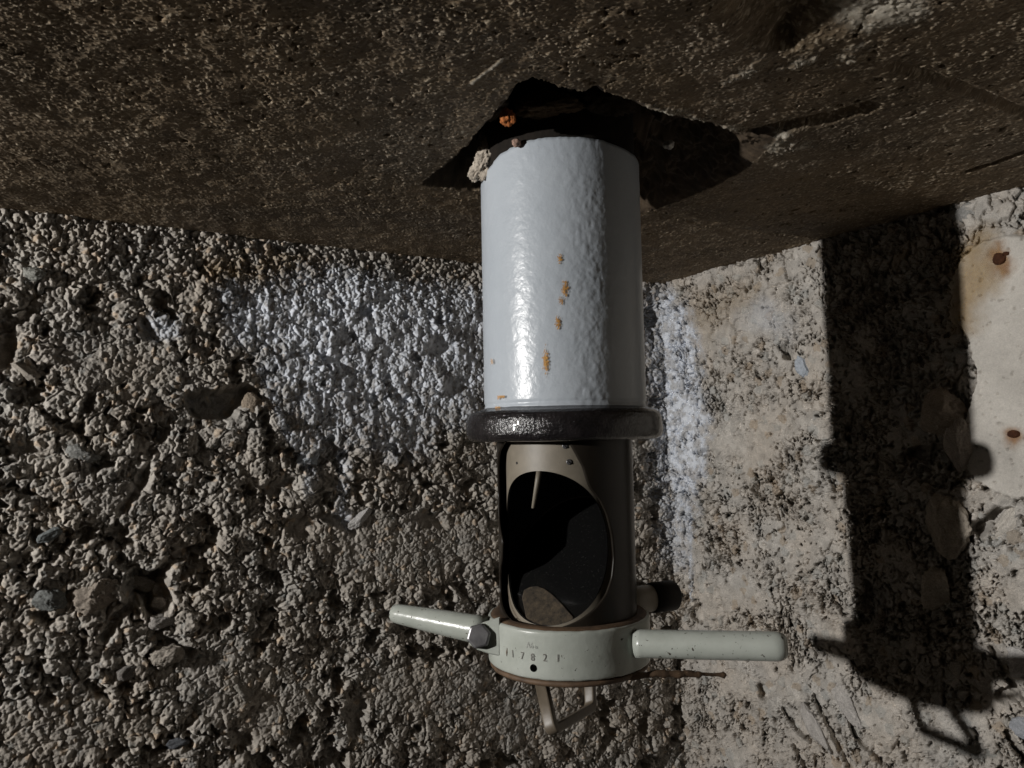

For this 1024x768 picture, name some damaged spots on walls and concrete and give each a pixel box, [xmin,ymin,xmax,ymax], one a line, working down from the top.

spalling [421,77,780,214]
corrosion [957,248,1009,322]
corrosion [1007,430,1020,442]